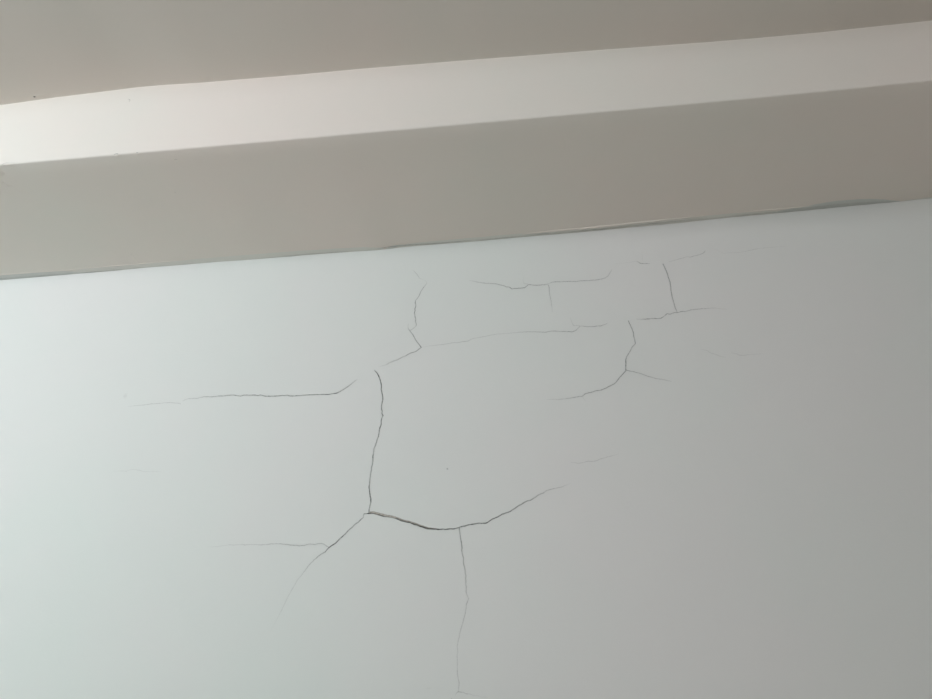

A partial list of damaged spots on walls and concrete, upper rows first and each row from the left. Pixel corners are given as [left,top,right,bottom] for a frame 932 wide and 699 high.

crack [367,490,518,543]